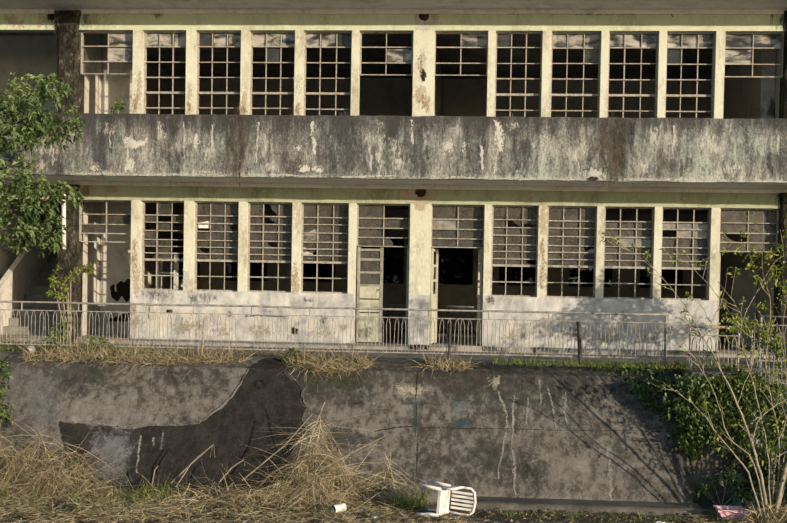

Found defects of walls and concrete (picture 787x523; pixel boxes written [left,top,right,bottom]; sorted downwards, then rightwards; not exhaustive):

spalling [415,14,440,31]
damp [91,111,114,170]
peeling [77,122,227,176]
damp [225,117,250,182]
peeling [341,122,484,179]
damp [511,133,537,183]
peeling [491,118,606,181]
damp [596,113,636,181]
damp [762,151,787,179]
spalling [398,189,437,211]
damp [85,421,142,484]
damp [488,371,663,501]